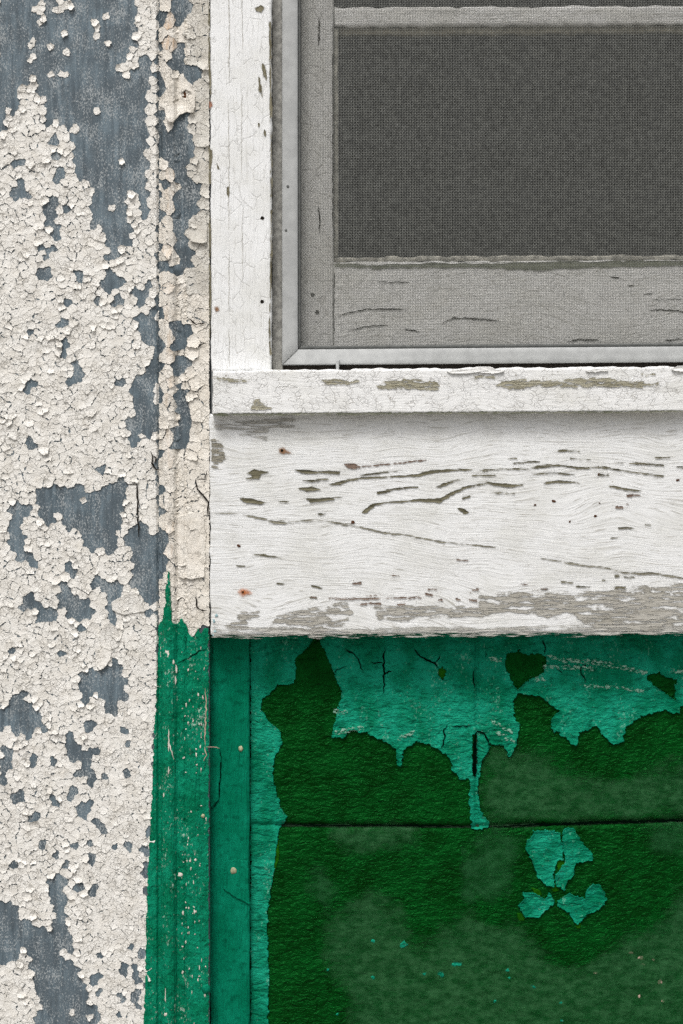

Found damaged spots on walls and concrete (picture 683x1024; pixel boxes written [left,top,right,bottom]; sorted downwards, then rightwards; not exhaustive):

peeling [0,0,296,469]
crack [335,647,392,693]
crack [414,649,440,668]
peeling [0,464,207,1024]
peeling [182,693,221,821]
crack [441,725,490,777]
peeling [223,632,683,1024]